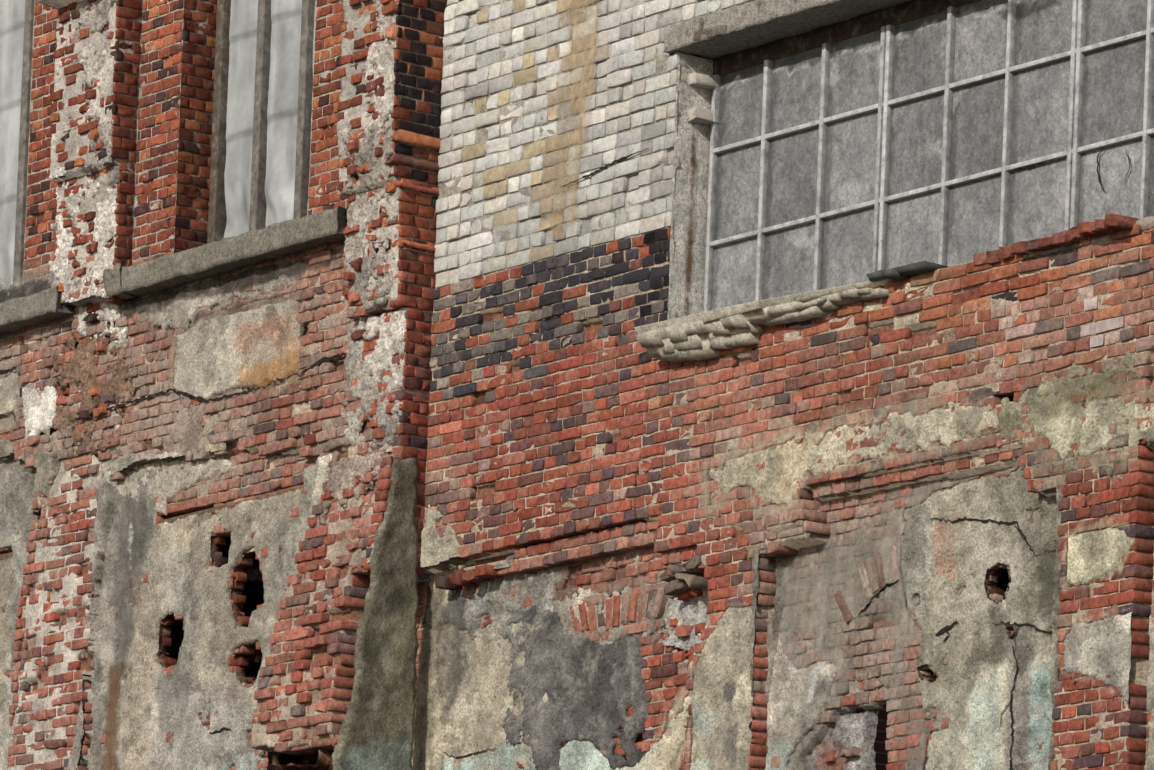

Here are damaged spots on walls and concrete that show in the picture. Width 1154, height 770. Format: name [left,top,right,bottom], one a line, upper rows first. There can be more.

flaking render [0,0,879,770]
flaking render [702,351,1154,516]
corrosion [102,665,123,770]
crack [858,579,899,615]
crack [935,621,957,642]
crack [930,516,1056,556]
flaking render [886,466,1133,770]
crack [993,621,1052,770]
flaking render [1144,615,1154,770]